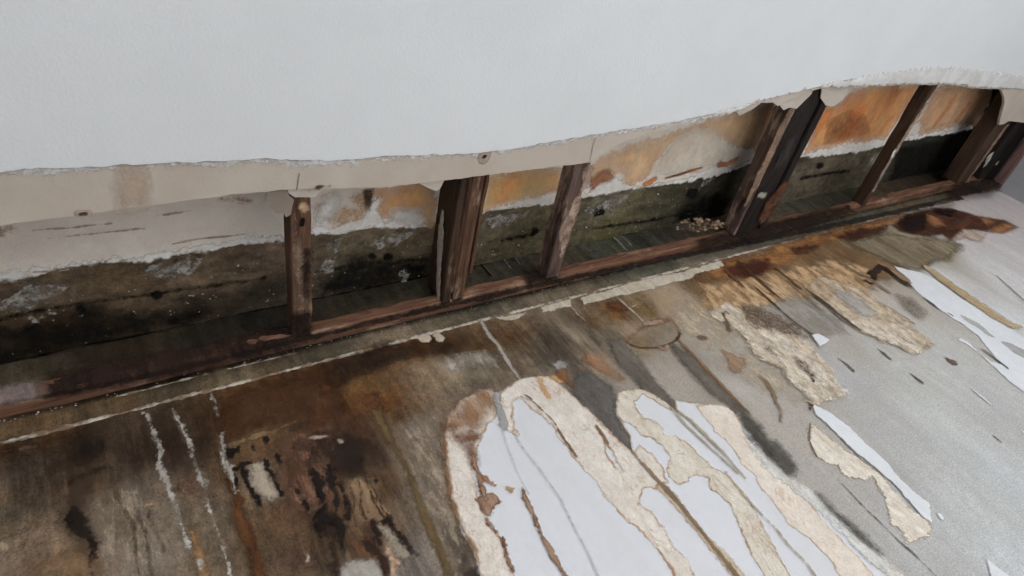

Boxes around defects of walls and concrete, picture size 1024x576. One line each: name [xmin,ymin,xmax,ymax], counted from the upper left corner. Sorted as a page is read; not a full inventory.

water stain [890,132,971,181]
water stain [319,188,373,223]
water stain [485,209,530,230]
water stain [678,178,730,222]
water stain [140,255,203,279]
water stain [319,229,429,295]
water stain [0,284,205,365]
peeling [706,302,849,406]
peeling [805,276,936,354]
water stain [0,428,110,576]
peeling [249,462,281,501]
water stain [214,341,449,576]